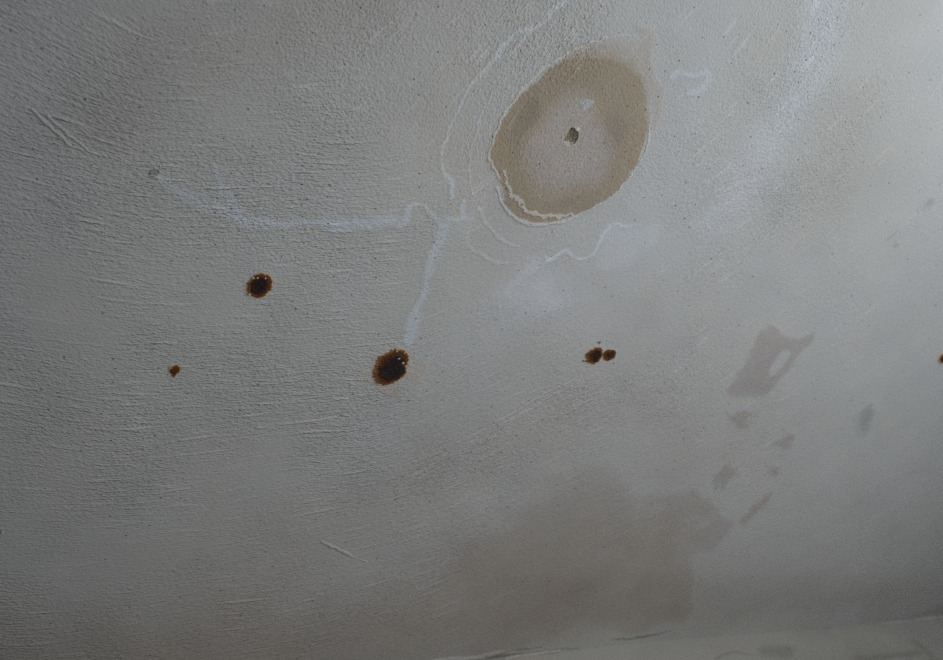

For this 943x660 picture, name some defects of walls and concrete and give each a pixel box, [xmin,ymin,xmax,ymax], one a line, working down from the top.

damp [486,22,715,228]
damp [152,0,666,348]
corrosion [242,268,277,302]
corrosion [167,362,184,379]
corrosion [354,344,430,400]
corrosion [581,340,617,367]